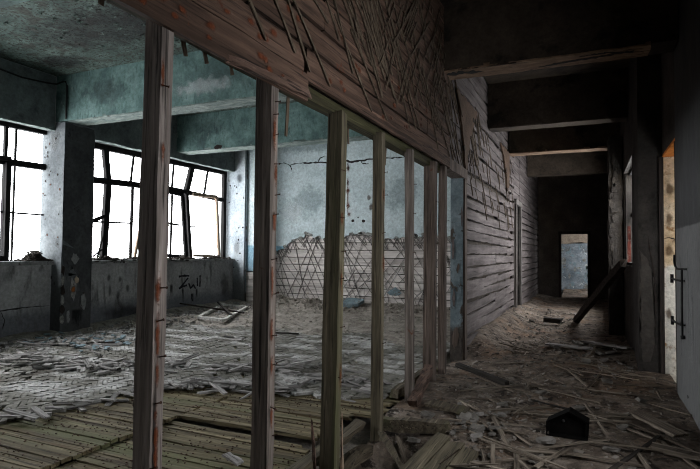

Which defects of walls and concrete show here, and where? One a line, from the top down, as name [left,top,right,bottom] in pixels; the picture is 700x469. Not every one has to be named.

crack [280,156,326,170]
crack [346,157,403,170]
flaking render [276,231,325,300]
flaking render [343,232,372,303]
flaking render [384,236,405,304]
flaking render [414,233,424,306]
peeling [437,236,462,353]